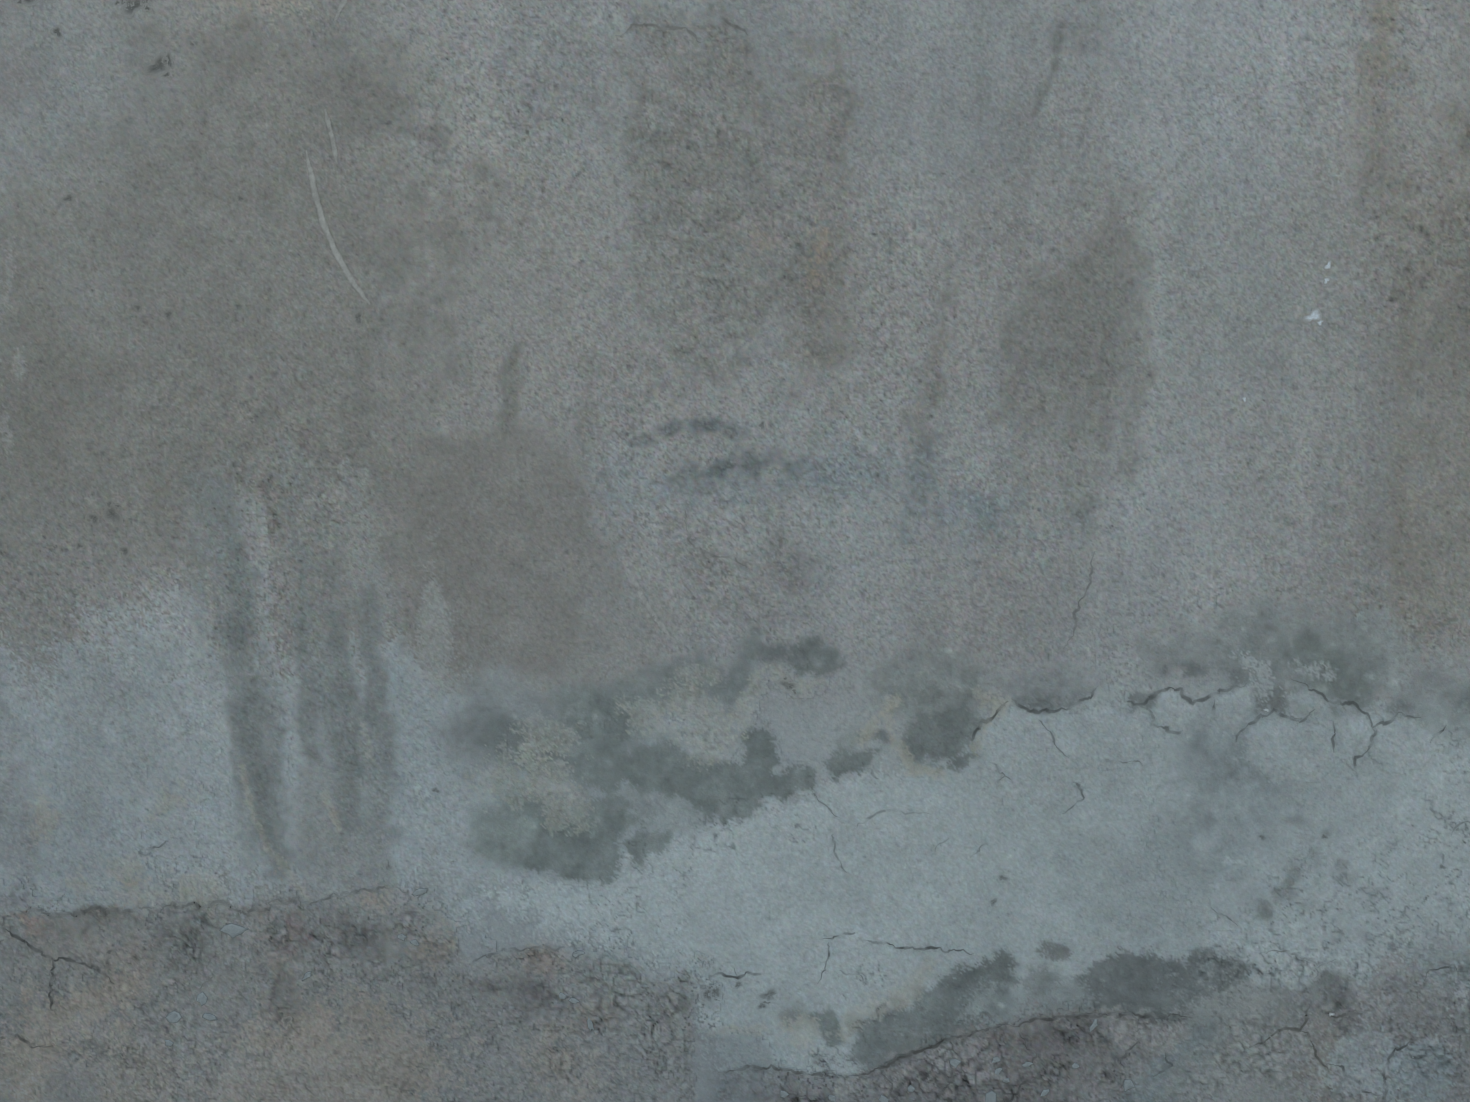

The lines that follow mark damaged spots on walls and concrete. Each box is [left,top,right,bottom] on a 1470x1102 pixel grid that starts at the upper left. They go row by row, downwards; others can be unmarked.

crack [971,678,1447,814]
crack [0,917,116,1049]
spalling [16,859,780,1093]
spalling [718,997,1195,1102]
damp [1103,1009,1238,1102]